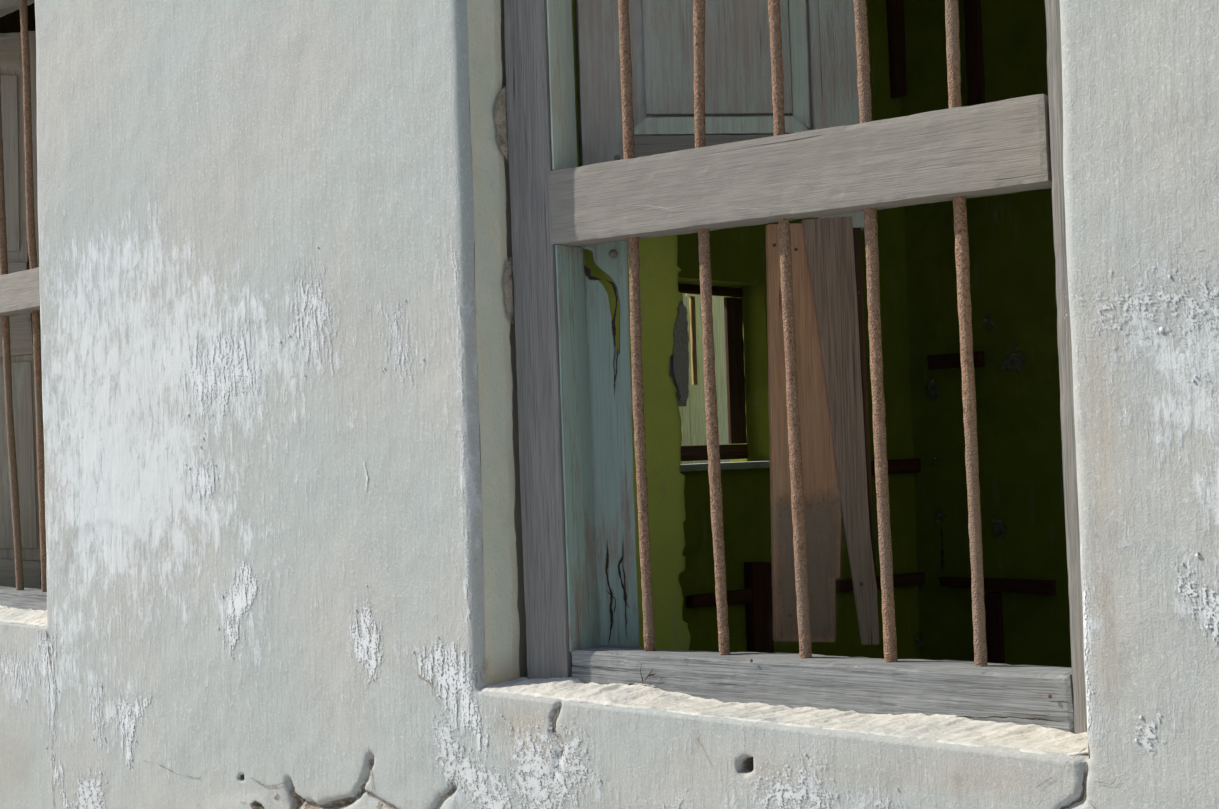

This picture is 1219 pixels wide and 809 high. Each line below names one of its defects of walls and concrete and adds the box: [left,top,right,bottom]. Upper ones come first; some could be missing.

crack [549,705,564,786]
crack [240,746,396,809]
crack [435,752,457,809]
crack [1036,748,1119,809]